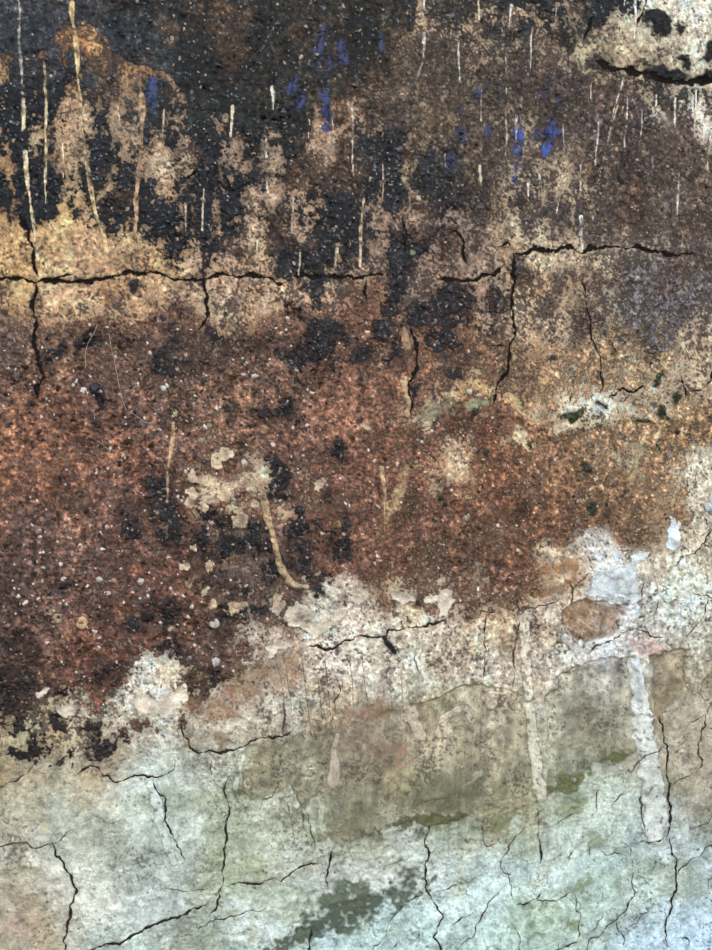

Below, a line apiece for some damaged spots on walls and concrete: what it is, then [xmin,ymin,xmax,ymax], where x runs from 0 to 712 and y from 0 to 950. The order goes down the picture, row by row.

water stain [0,0,712,429]
crack [0,216,388,398]
crack [438,229,695,403]
rust [0,275,712,723]
water stain [382,635,397,654]
crack [307,573,589,687]
water stain [586,503,617,521]
flaking render [562,551,650,641]
crack [0,831,78,950]
crack [76,706,332,950]
water stain [263,858,437,950]
crack [373,685,712,950]